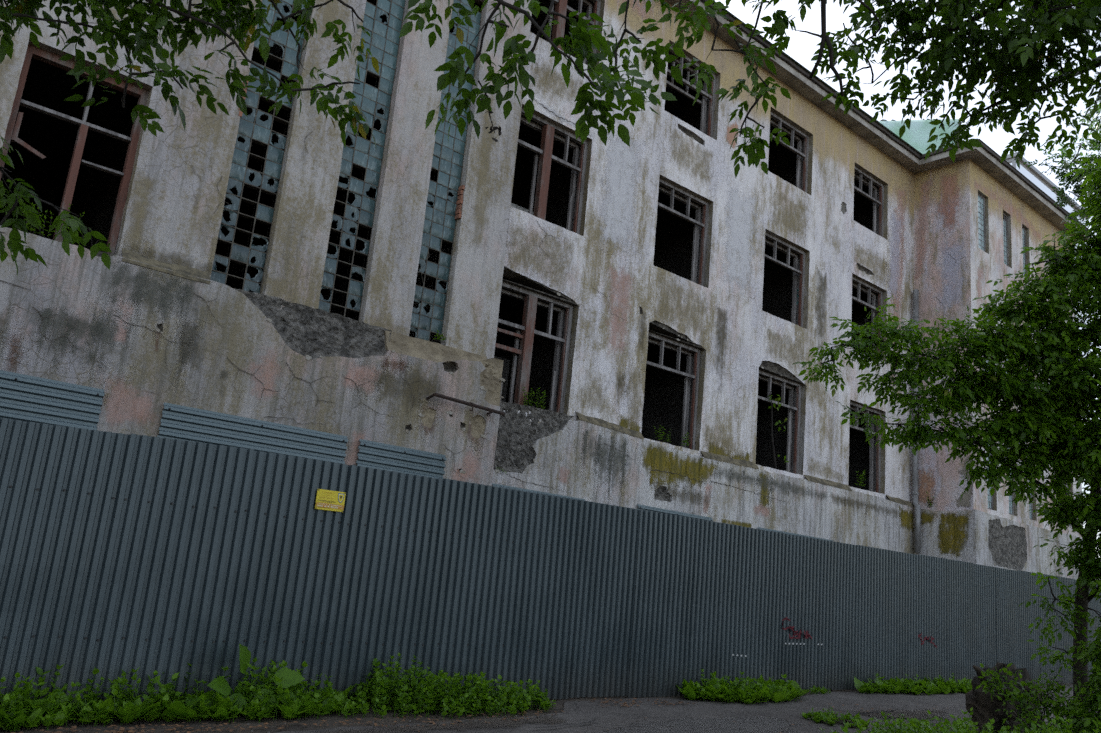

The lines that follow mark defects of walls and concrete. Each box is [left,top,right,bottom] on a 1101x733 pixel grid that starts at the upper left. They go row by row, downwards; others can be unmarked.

spalling [233,288,574,473]
leakage [650,448,707,503]
spalling [988,519,1027,570]